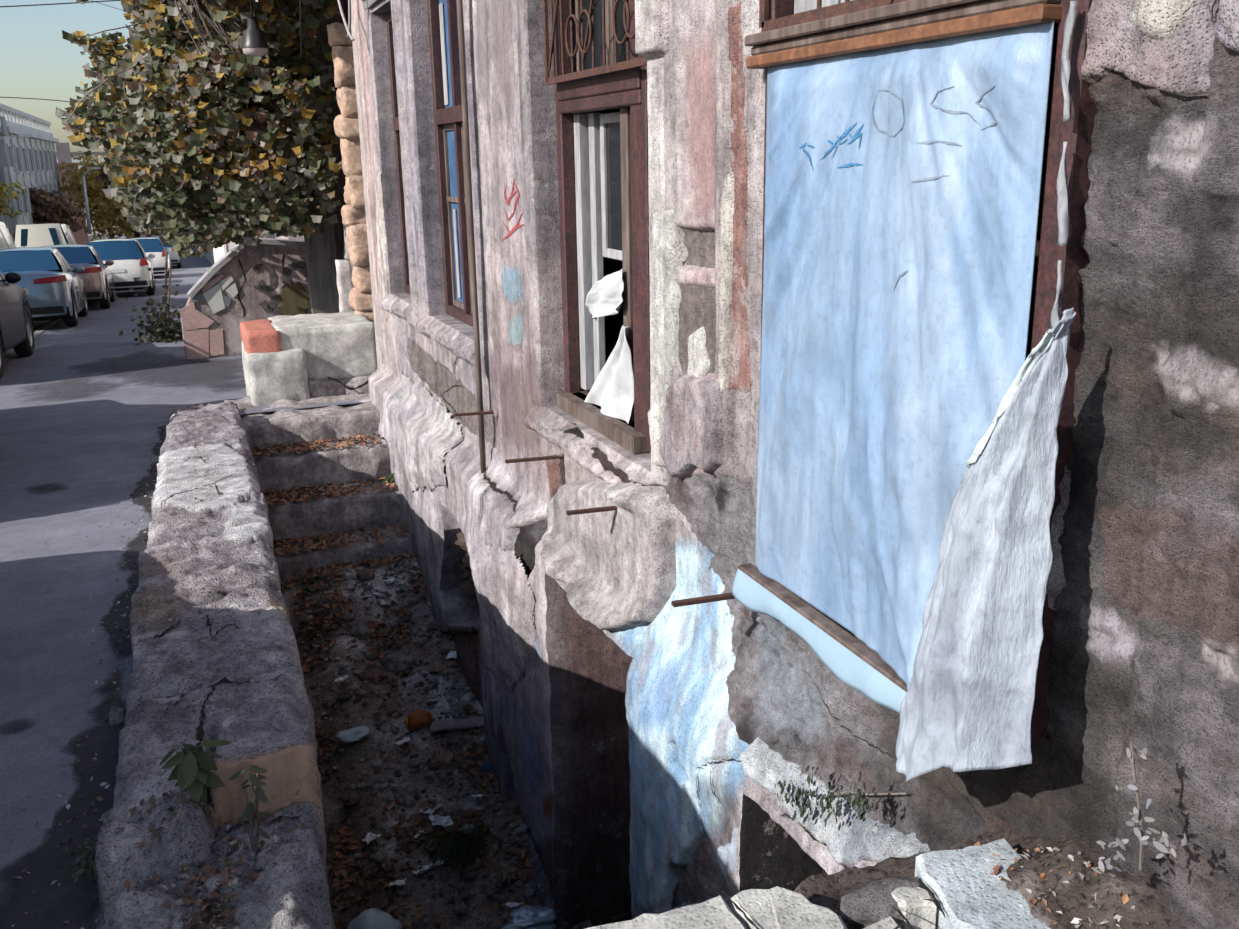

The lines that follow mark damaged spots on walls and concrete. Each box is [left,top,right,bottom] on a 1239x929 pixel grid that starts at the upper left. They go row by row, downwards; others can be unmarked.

spalling [406,336,497,448]
spalling [514,0,1239,929]
spalling [451,631,483,707]
crack [151,674,284,751]
crack [723,890,759,929]